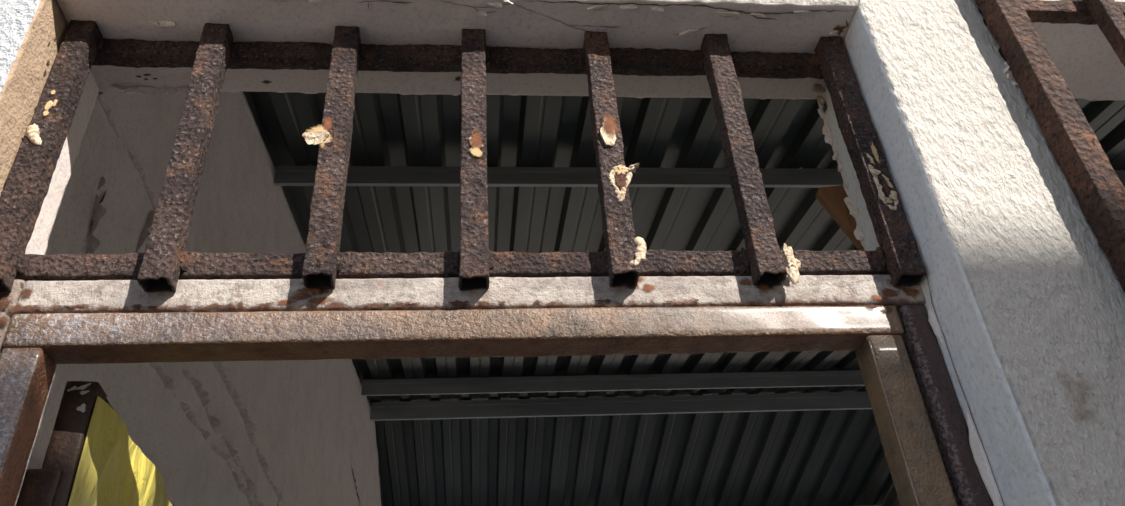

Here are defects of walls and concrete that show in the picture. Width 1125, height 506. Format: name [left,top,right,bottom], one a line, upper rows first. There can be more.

crack [359,0,413,12]
peeling [476,0,513,16]
crack [440,0,860,37]
corrosion [0,288,117,327]
corrosion [206,282,346,308]
corrosion [365,301,421,309]
corrosion [866,281,919,312]